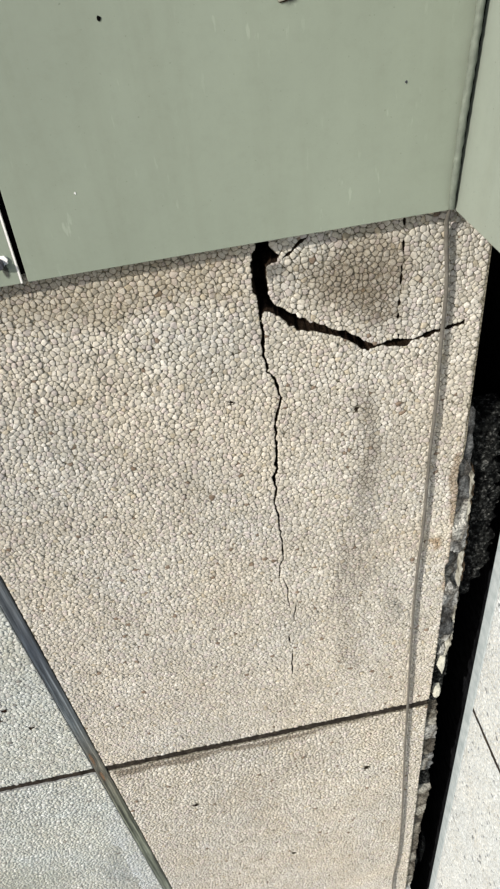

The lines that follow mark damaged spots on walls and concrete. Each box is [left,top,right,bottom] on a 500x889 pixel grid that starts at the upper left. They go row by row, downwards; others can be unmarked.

crack [250,218,465,673]
spalling [406,246,500,889]